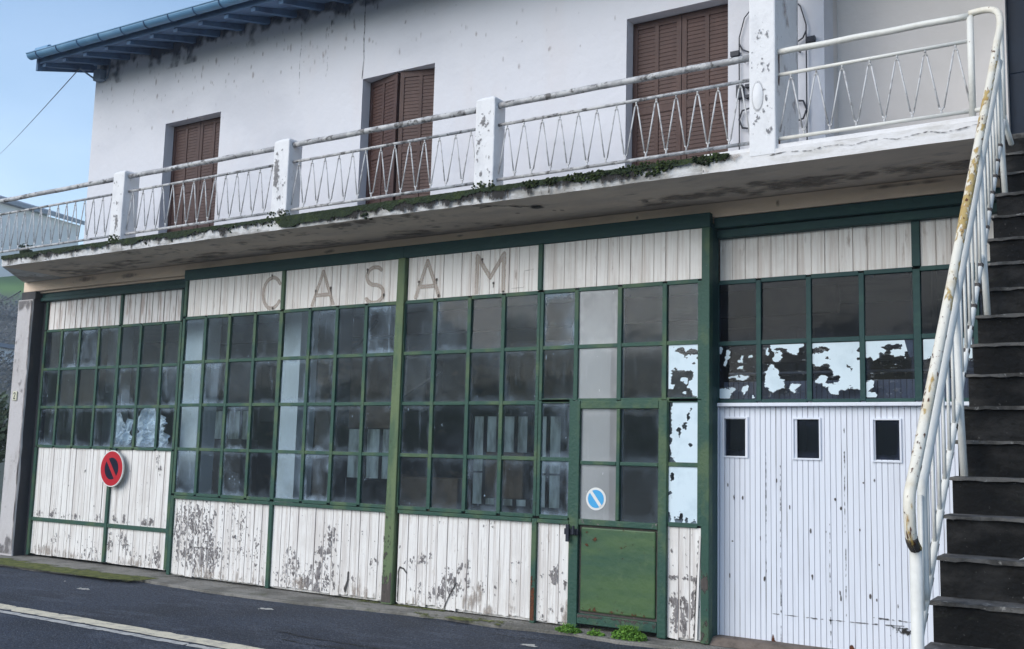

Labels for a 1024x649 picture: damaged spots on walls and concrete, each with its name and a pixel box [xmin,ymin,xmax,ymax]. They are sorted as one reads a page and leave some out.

water stain [392,178,586,212]
water stain [601,168,660,186]
water stain [645,172,875,207]
water stain [880,160,970,188]
rust [955,57,998,247]
peeling [720,347,755,399]
peeling [764,340,907,397]
peeling [668,344,698,523]
peeling [33,495,263,582]
peeling [275,524,363,592]
peeling [410,560,496,607]
peeling [668,553,708,640]